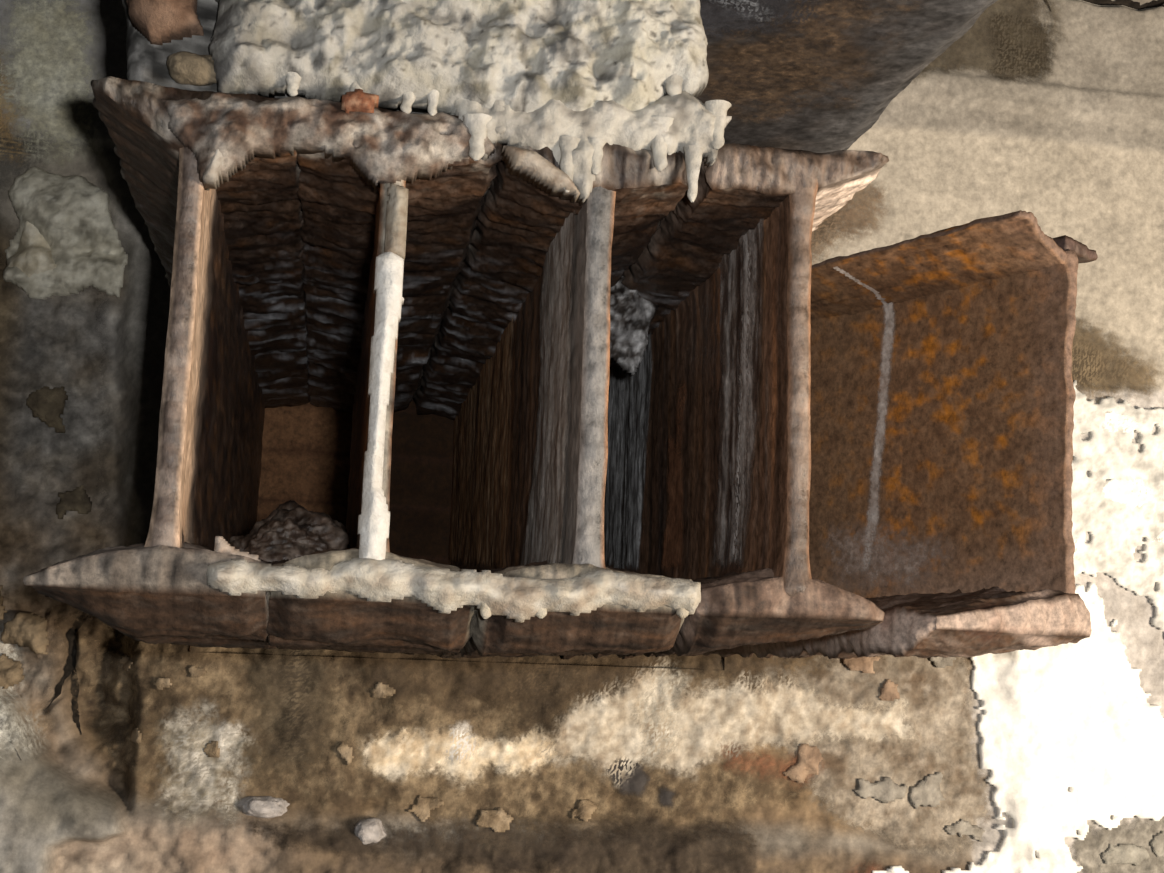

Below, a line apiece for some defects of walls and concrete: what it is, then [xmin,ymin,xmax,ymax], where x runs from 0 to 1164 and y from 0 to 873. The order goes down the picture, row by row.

leakage [916,0,1061,80]
crack [1083,0,1164,10]
leakage [162,0,814,623]
crack [44,615,91,735]